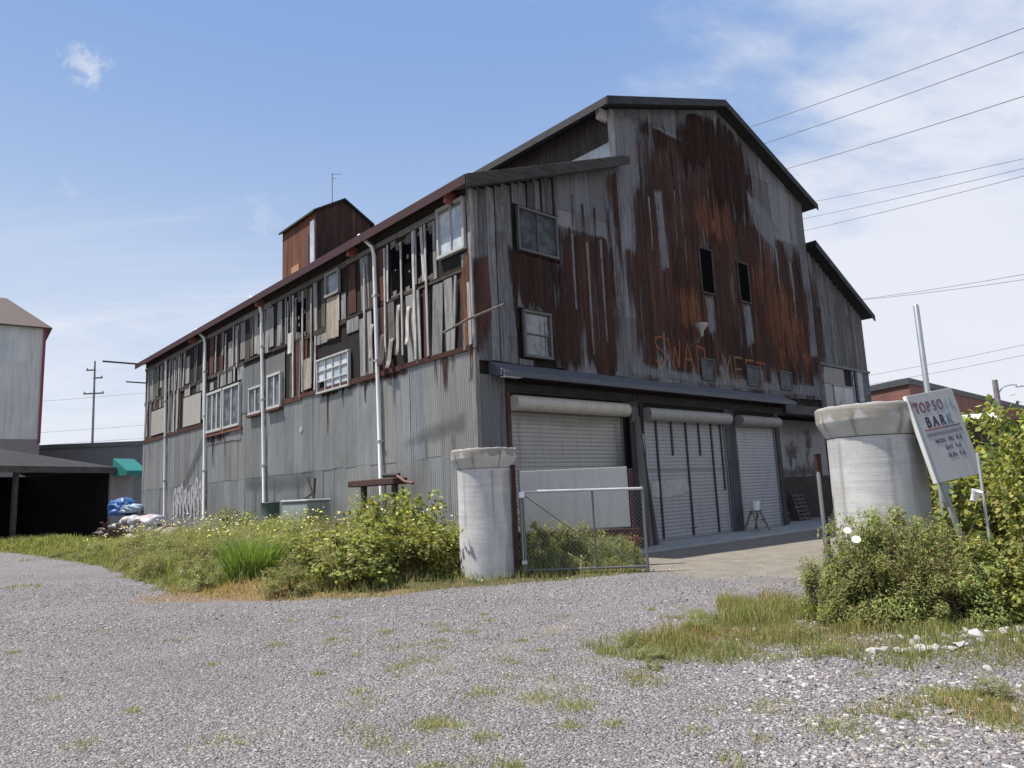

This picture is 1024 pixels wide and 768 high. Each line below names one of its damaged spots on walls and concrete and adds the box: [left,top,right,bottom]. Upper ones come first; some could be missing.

rust [508,113,825,405]